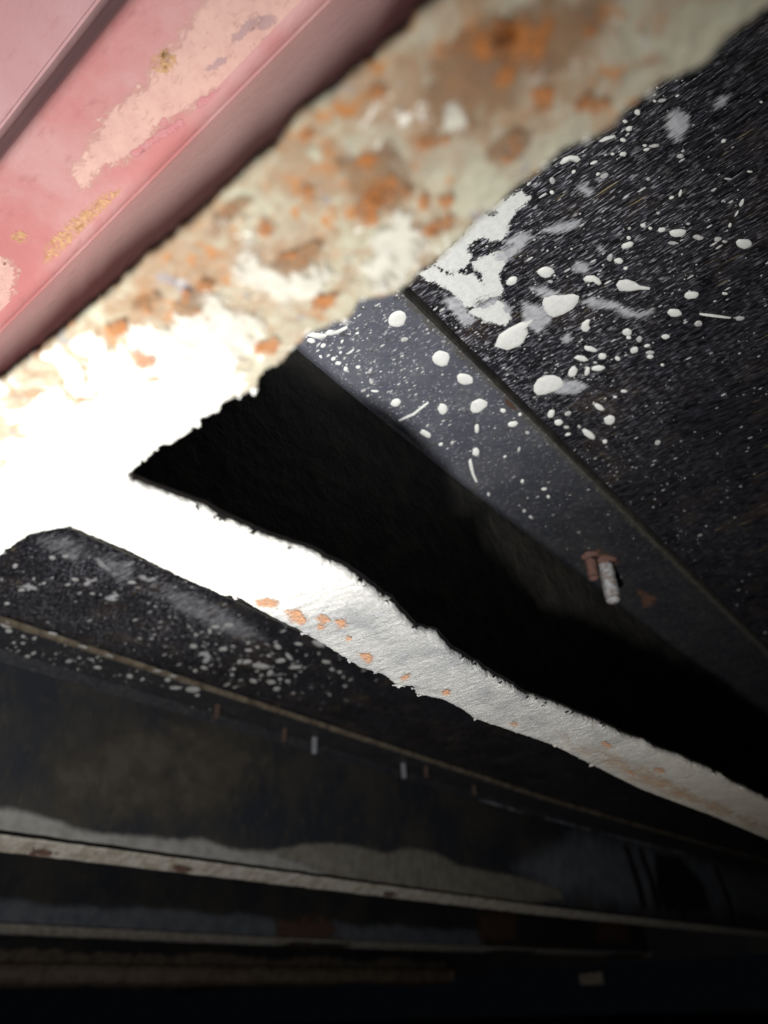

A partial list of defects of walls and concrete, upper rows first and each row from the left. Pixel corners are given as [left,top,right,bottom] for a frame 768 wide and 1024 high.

corrosion [416,0,609,151]
peeling [71,0,301,189]
corrosion [486,130,528,164]
corrosion [333,145,454,237]
corrosion [212,198,251,233]
corrosion [272,242,321,275]
corrosion [103,294,160,338]
corrosion [172,281,214,317]
corrosion [310,295,336,312]
corrosion [252,339,280,355]
corrosion [256,598,352,641]